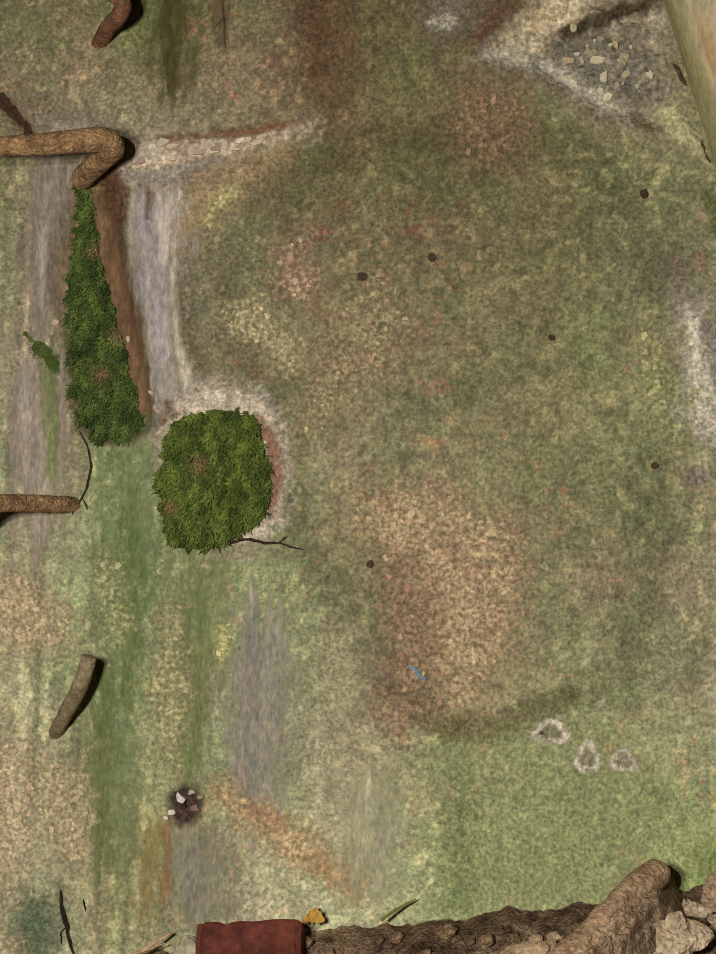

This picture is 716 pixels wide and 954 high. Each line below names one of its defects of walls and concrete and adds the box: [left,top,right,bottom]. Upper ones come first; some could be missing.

damp [130,142,297,562]
damp [670,260,716,456]